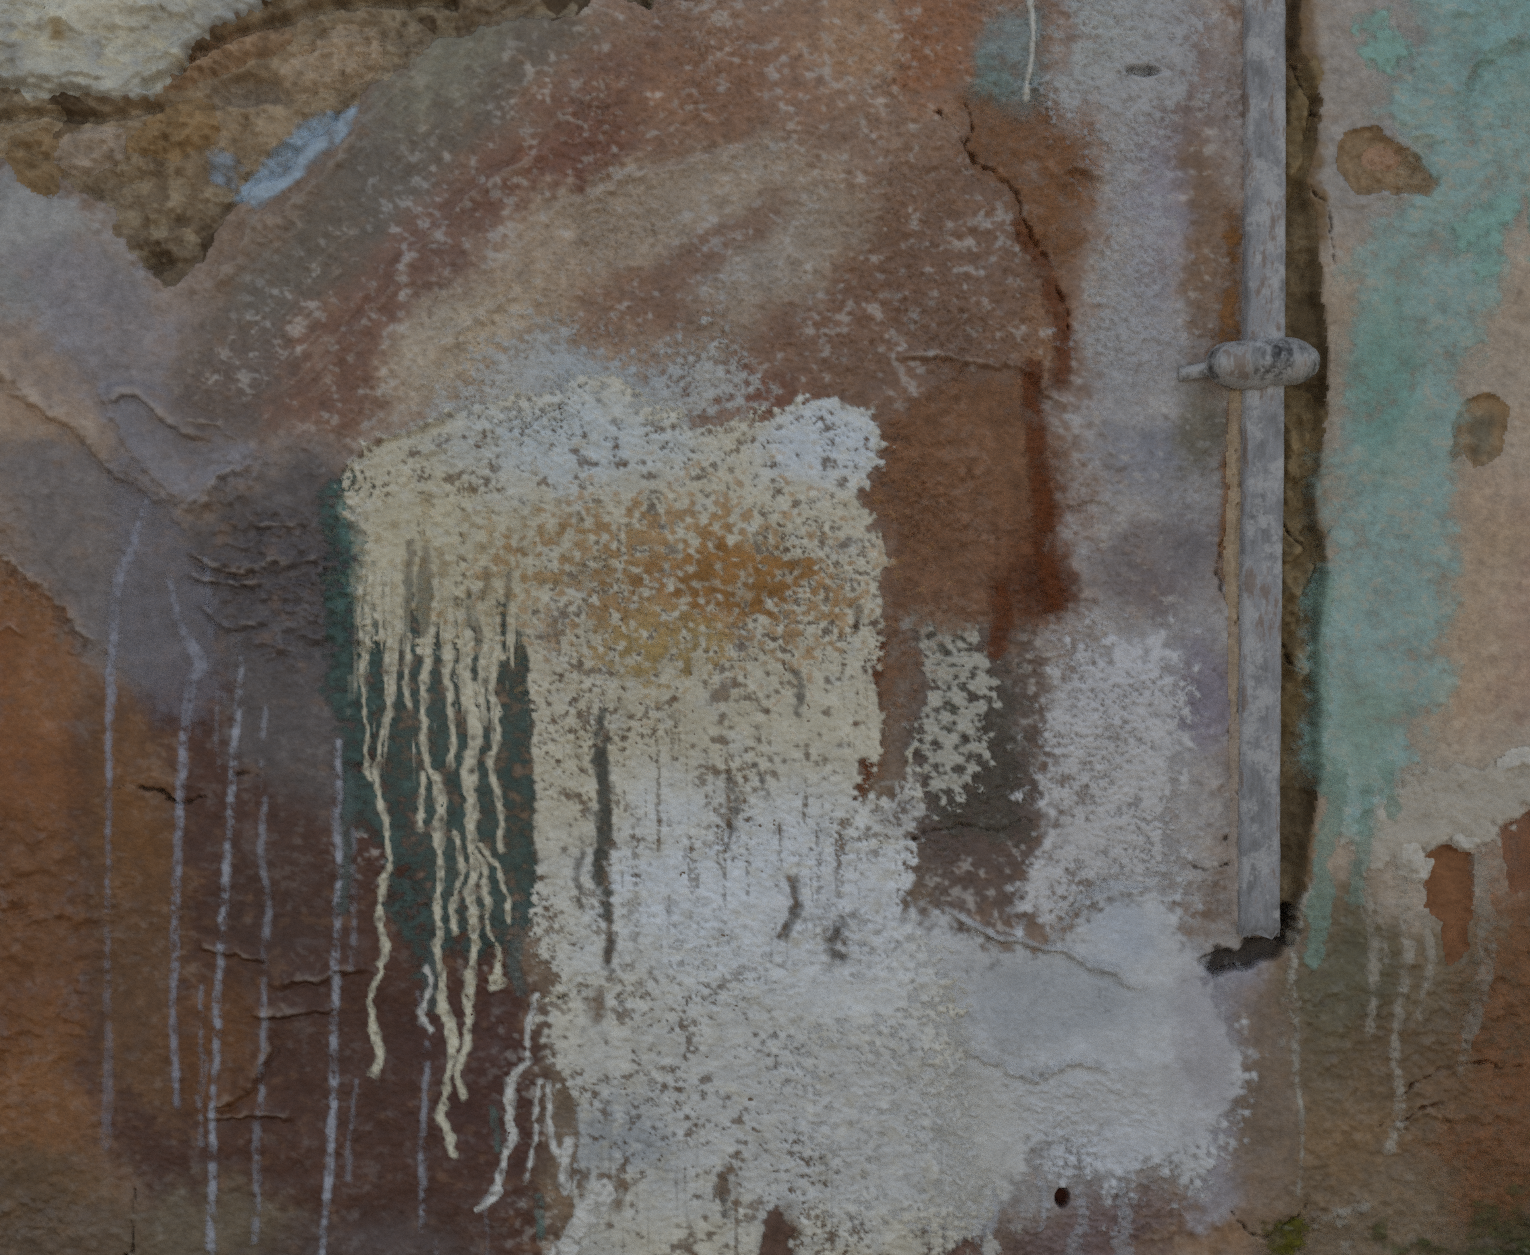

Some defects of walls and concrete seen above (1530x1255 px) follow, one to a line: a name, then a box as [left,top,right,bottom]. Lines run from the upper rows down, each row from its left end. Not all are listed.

spalling [627,0,655,10]
spalling [0,0,590,288]
crack [937,112,1044,256]
corrosion [853,221,1078,731]
peeling [1280,0,1530,966]
damp [172,712,190,927]
damp [227,668,244,814]
damp [334,740,343,930]
corrosion [853,749,886,796]
damp [206,843,231,1253]
damp [331,953,340,1008]
damp [319,1075,339,1255]